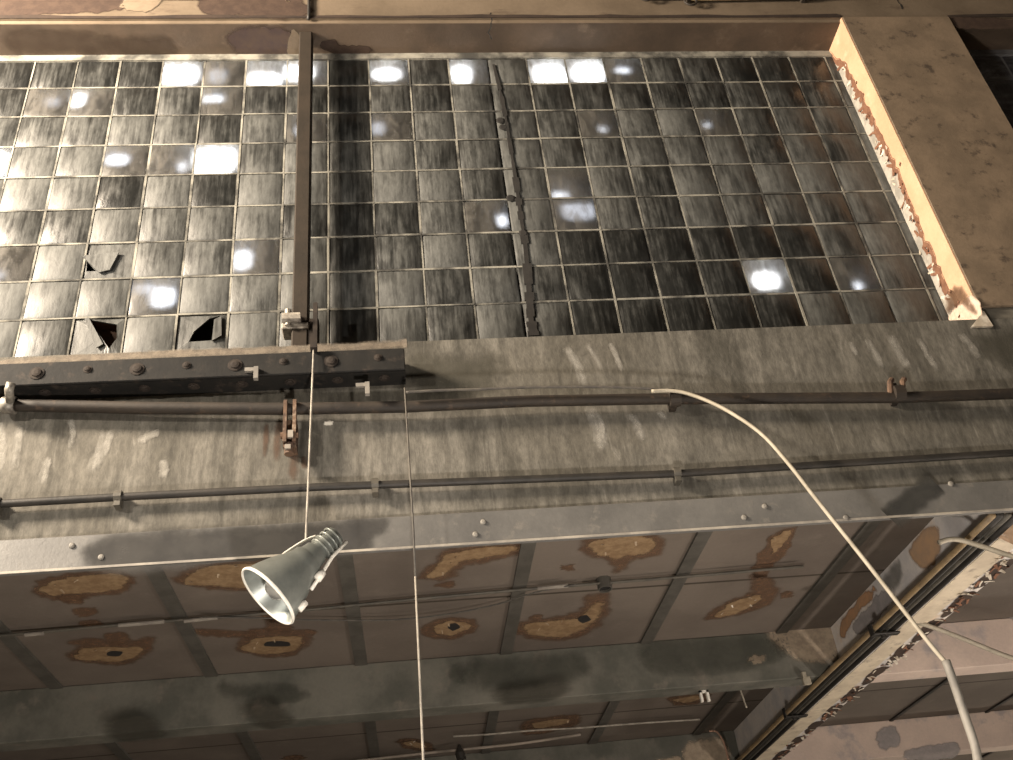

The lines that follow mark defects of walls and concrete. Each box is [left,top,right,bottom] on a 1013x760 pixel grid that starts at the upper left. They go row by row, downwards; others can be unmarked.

peeling [0,0,162,15]
peeling [198,0,314,19]
peeling [287,29,299,54]
peeling [33,519,385,666]
peeling [419,544,520,588]
peeling [579,535,664,572]
peeling [705,528,795,620]
peeling [909,526,940,569]
peeling [421,617,478,640]
peeling [517,593,609,641]
peeling [769,552,1013,760]